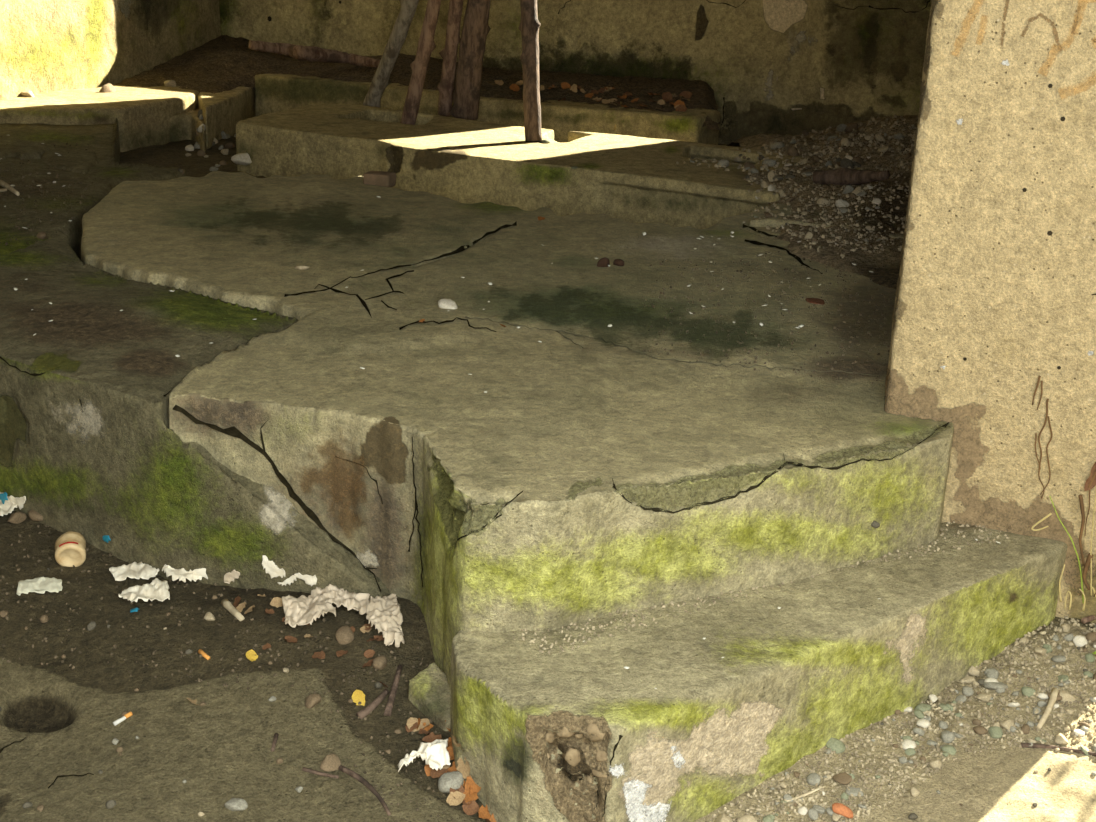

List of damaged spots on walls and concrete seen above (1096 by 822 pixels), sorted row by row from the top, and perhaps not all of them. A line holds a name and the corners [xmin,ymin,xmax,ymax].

crack [284,221,880,376]
crack [163,391,383,592]
crack [612,422,949,513]
peeling [525,701,783,822]